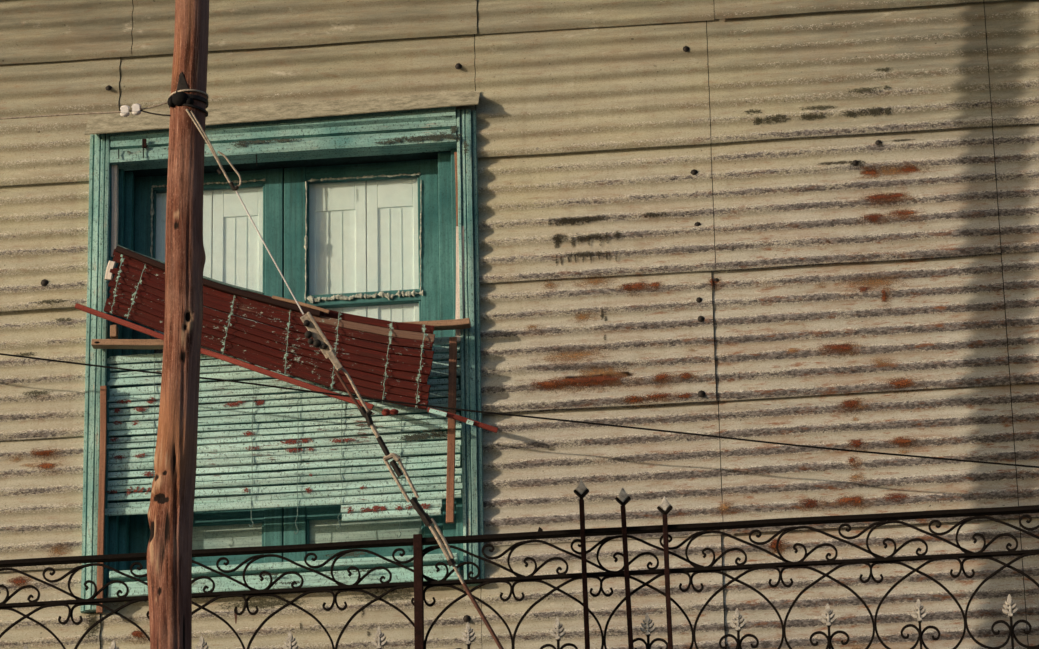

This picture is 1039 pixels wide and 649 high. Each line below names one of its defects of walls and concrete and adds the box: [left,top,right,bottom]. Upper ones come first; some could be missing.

corrosion [862,165,919,179]
corrosion [864,193,915,225]
corrosion [578,274,659,295]
corrosion [532,349,697,408]
peeling [110,397,157,442]
corrosion [841,398,863,421]
peeling [280,438,357,453]
corrosion [10,449,60,469]
peeling [107,471,155,495]
corrosion [801,496,870,510]
corrosion [883,493,908,502]